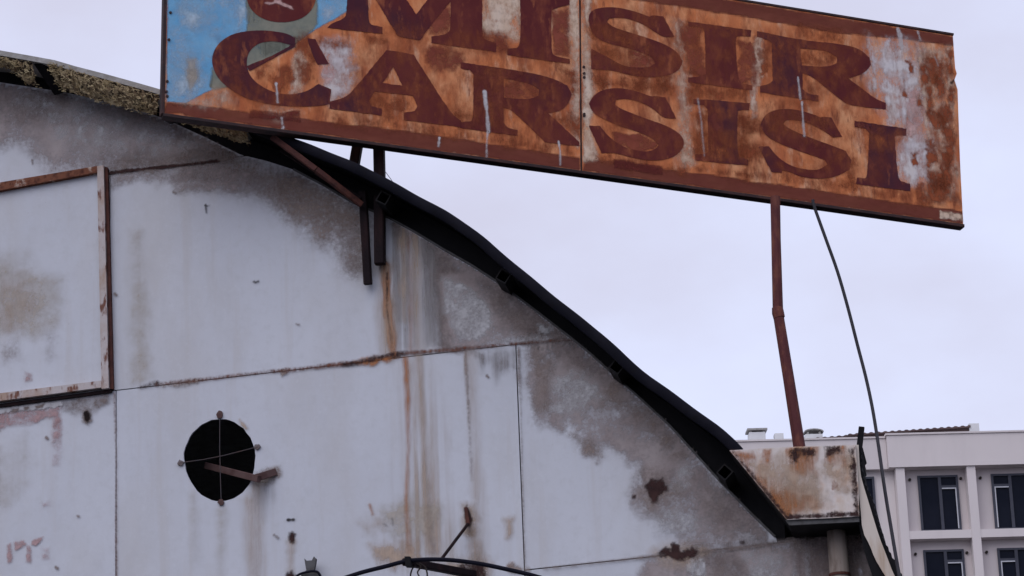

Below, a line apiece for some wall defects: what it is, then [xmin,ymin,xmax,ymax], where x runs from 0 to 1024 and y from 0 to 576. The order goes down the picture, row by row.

corrosion [109,159,220,175]
leakage [0,83,362,269]
corrosion [271,262,533,411]
corrosion [140,373,258,388]
leakage [393,222,829,576]
spalling [632,473,679,508]
corrosion [736,446,859,519]
leakage [847,535,872,576]